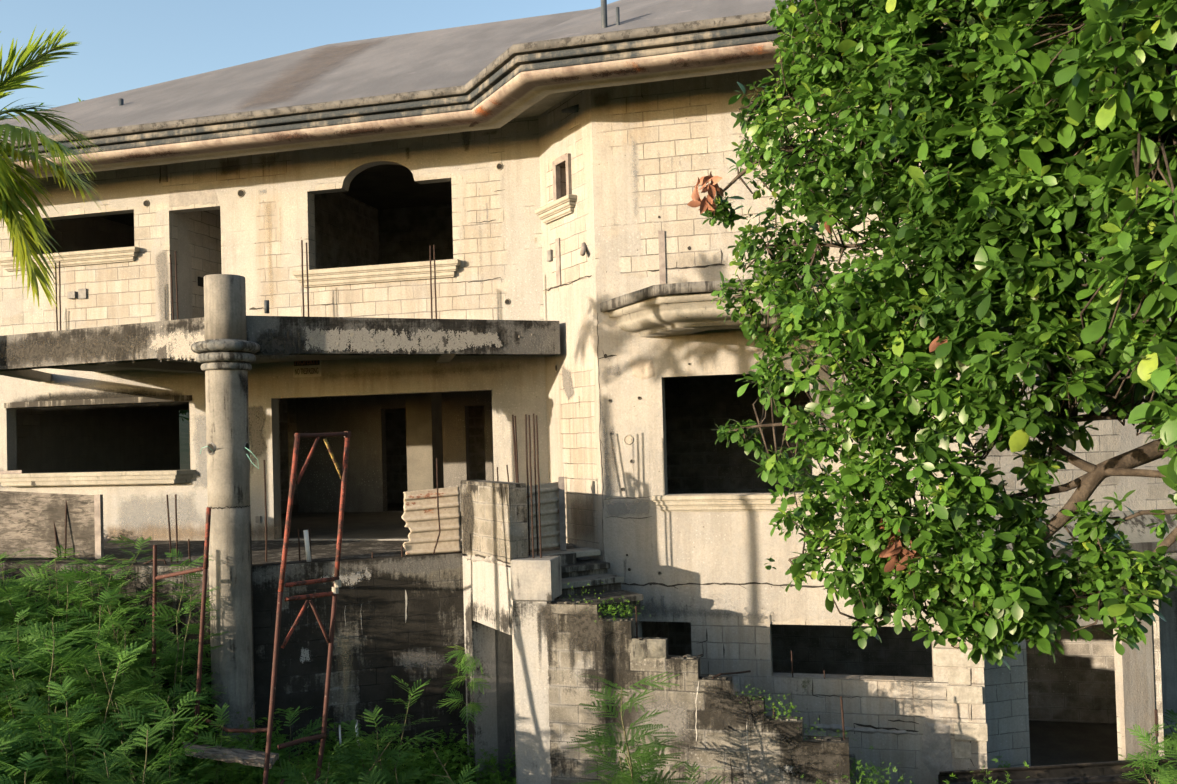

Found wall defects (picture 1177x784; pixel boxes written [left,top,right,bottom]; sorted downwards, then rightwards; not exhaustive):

corrosion [722,46,766,63]
corrosion [552,67,646,81]
corrosion [272,133,315,141]
corrosion [336,126,384,136]
peeling [301,240,503,354]
crack [597,313,652,559]
leakage [321,567,371,586]
crack [621,581,839,589]
leakage [537,604,628,675]
efflorescence [404,652,445,677]
leakage [637,700,688,739]
leakage [780,736,845,784]